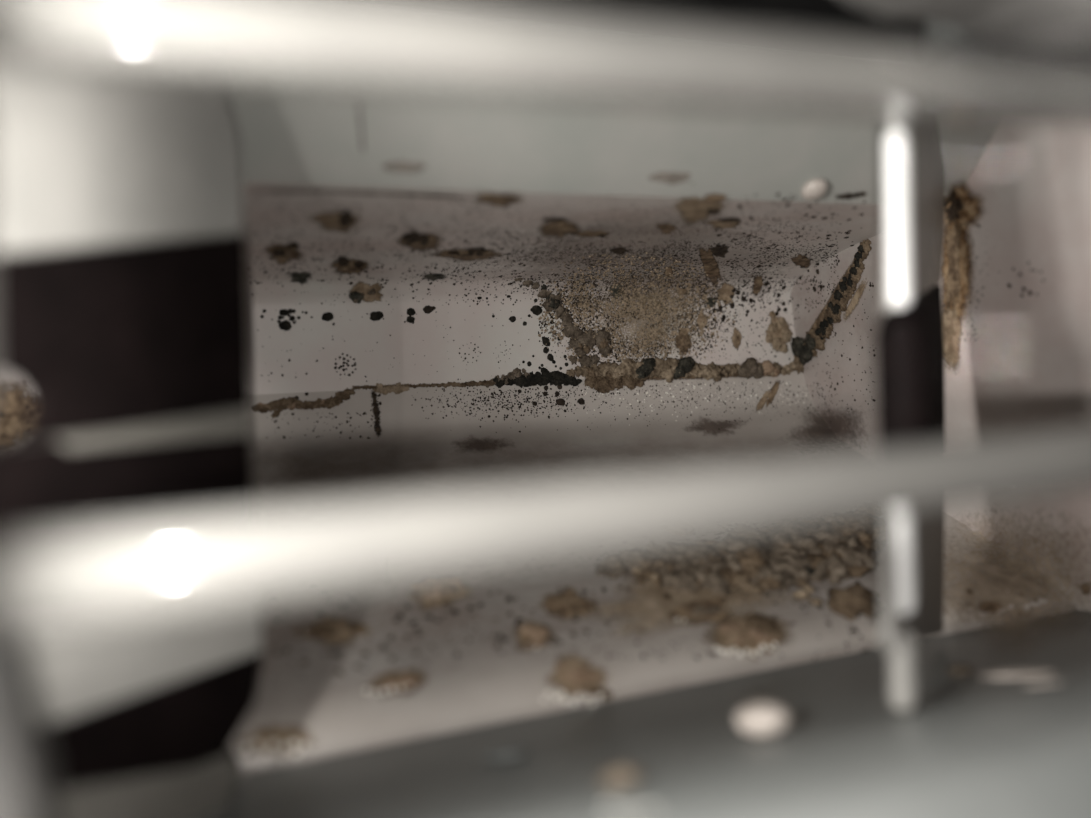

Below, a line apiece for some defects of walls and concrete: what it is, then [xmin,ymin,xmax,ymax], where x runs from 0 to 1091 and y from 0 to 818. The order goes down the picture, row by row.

damp [246,172,876,450]
corrosion [942,219,973,370]
crack [370,390,382,436]